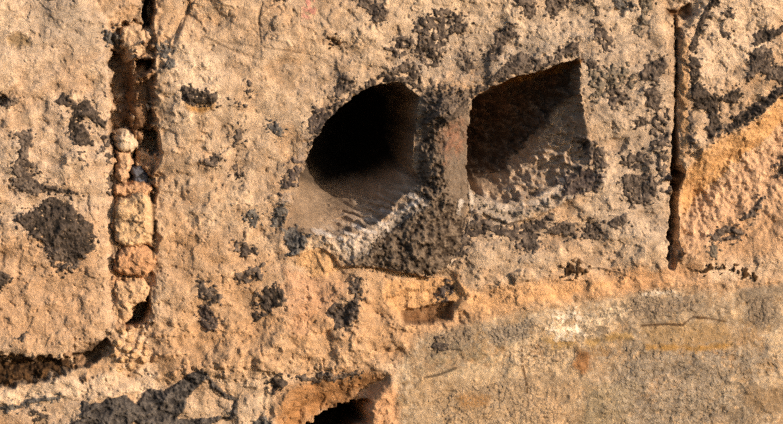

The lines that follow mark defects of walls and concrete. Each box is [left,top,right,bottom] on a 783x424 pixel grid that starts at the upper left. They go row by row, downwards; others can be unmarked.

crack [140,0,152,32]
crack [666,18,691,261]